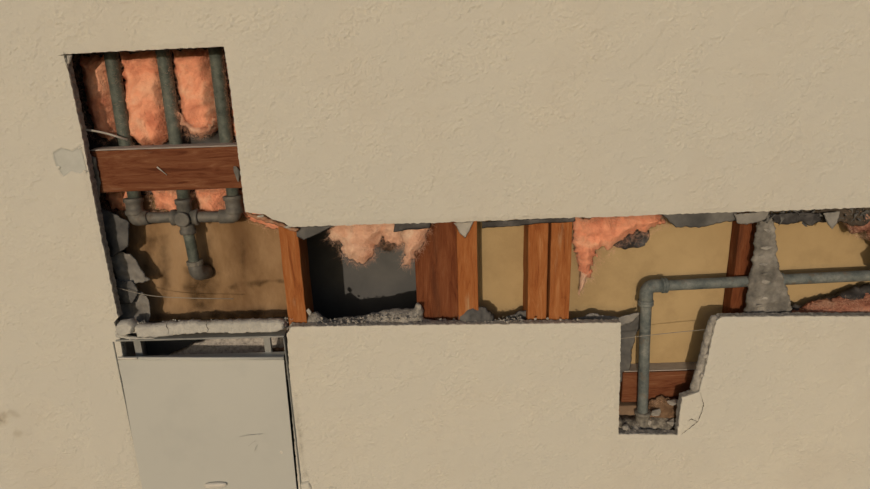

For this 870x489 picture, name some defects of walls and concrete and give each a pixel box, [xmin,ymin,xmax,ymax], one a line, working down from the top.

spalling [53,51,156,357]
spalling [454,221,473,238]
spalling [288,302,621,332]
spalling [618,312,870,435]